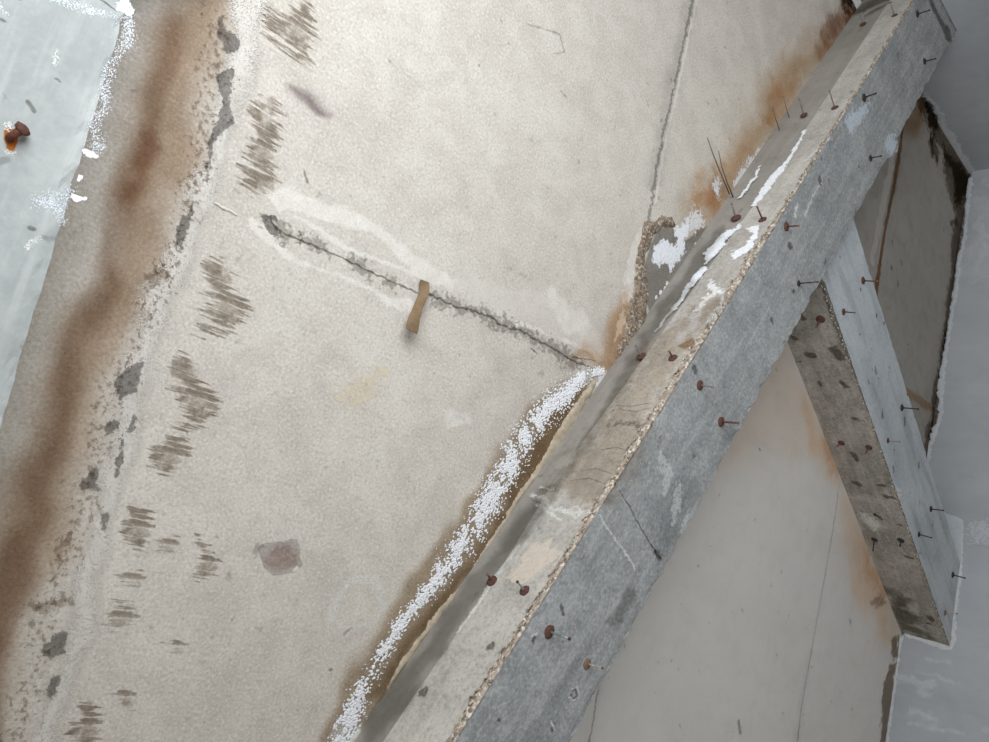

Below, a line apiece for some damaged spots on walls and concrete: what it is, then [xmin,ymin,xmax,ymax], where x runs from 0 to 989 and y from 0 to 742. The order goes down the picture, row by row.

leakage [31,184,78,226]
leakage [84,0,138,154]
leakage [248,218,414,313]
leakage [294,213,426,280]
leakage [614,274,634,342]
crack [654,0,698,204]
spalling [445,0,914,742]
leakage [712,130,806,206]
leakage [924,98,969,273]
leakage [327,320,607,742]